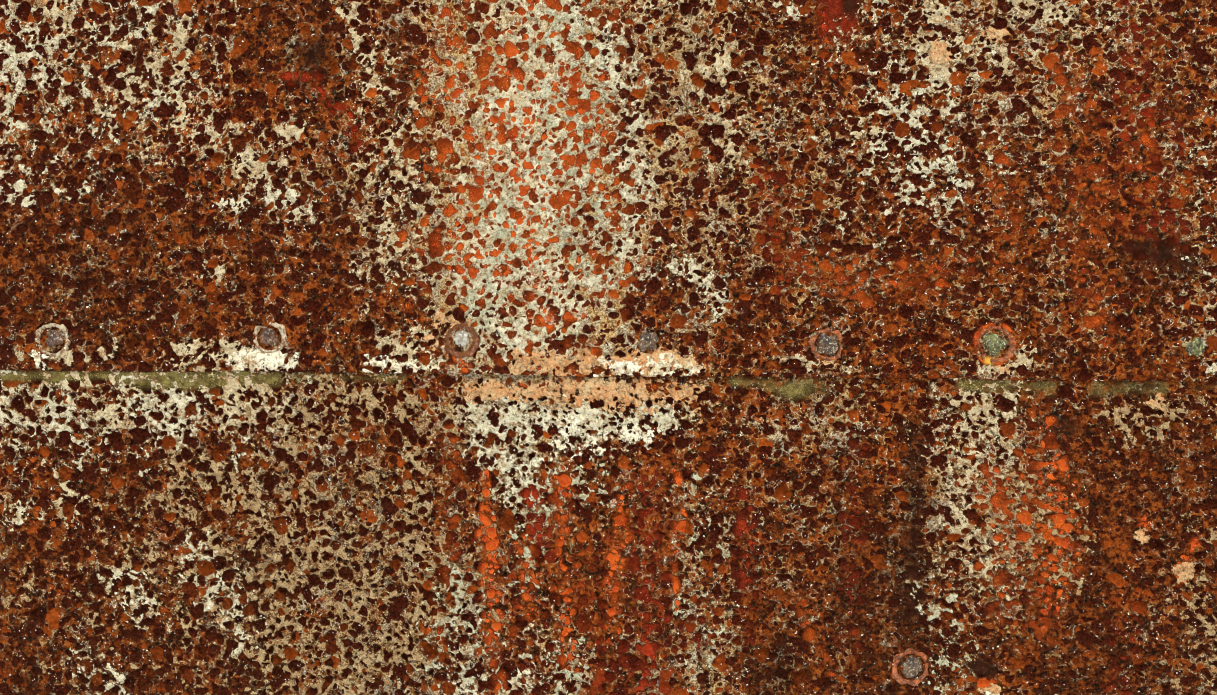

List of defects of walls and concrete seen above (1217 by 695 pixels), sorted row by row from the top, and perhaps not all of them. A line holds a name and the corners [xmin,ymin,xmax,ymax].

corrosion [397,0,719,424]
corrosion [817,0,860,77]
corrosion [1116,0,1199,274]
corrosion [974,323,1017,365]
corrosion [1143,393,1169,411]
corrosion [476,470,506,692]
corrosion [514,465,581,670]
corrosion [598,468,695,695]
corrosion [968,658,1005,695]
corrosion [976,415,1081,630]
corrosion [1133,516,1151,545]
corrosion [1172,538,1200,586]